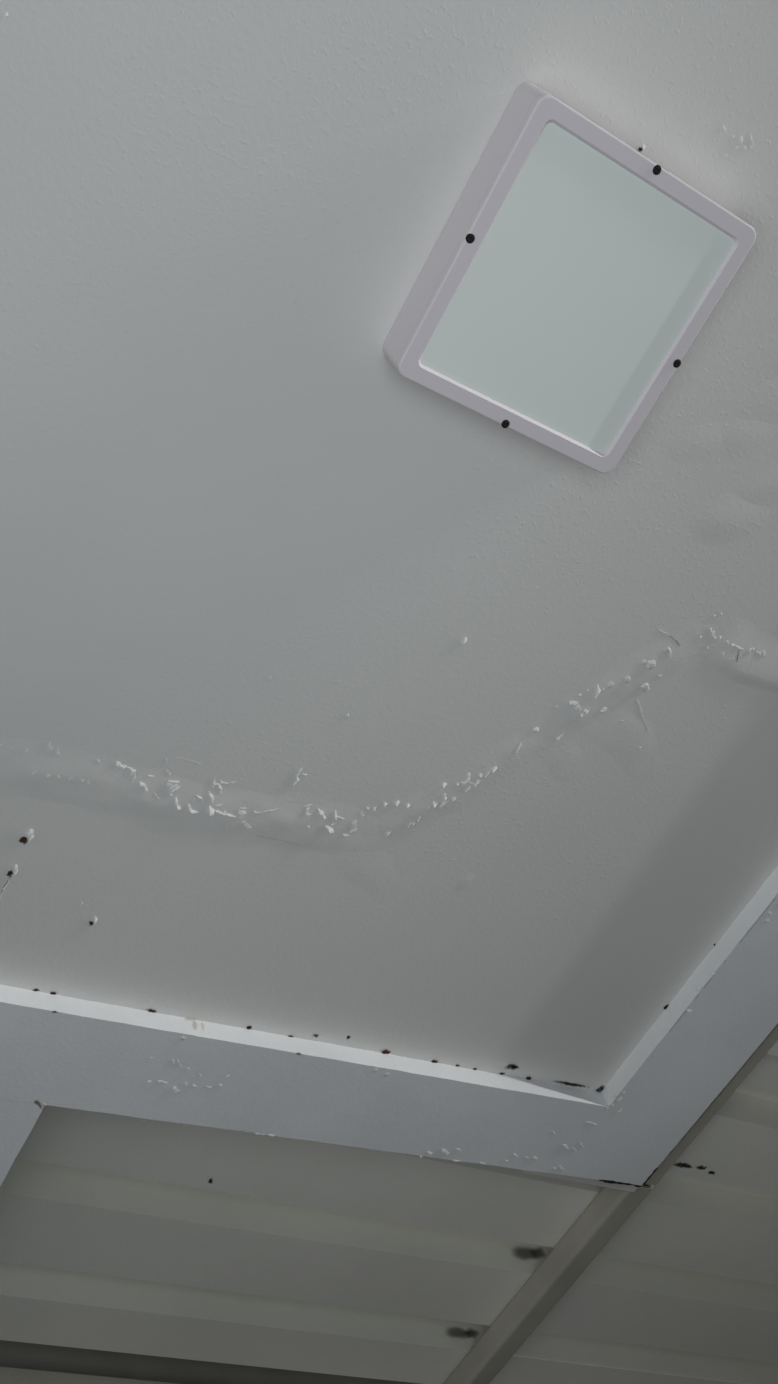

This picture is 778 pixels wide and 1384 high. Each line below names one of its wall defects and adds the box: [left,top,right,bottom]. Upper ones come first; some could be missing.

peeling [555,647,671,741]
spalling [19,829,34,844]
peeling [96,757,277,830]
peeling [306,766,497,836]